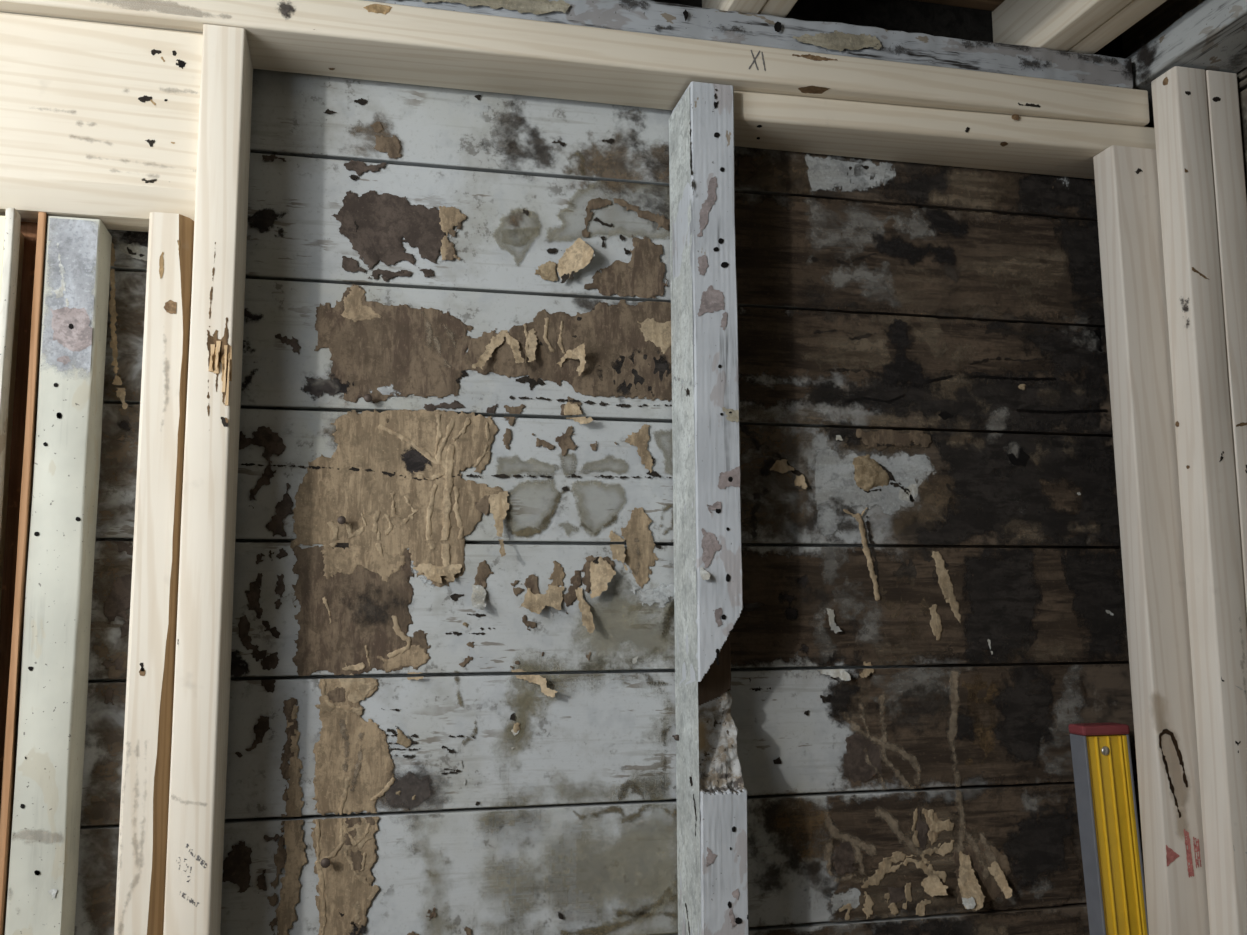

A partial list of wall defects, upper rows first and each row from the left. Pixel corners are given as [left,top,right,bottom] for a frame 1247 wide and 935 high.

water stain [481,101,551,166]
water stain [494,133,670,265]
water stain [734,150,757,182]
water stain [831,155,875,189]
water stain [930,171,1004,214]
peeling [314,116,672,456]
peeling [614,424,661,477]
water stain [739,419,818,547]
peeling [820,421,958,538]
peeling [446,560,495,667]
peeling [510,507,663,633]
peeling [921,851,1013,911]